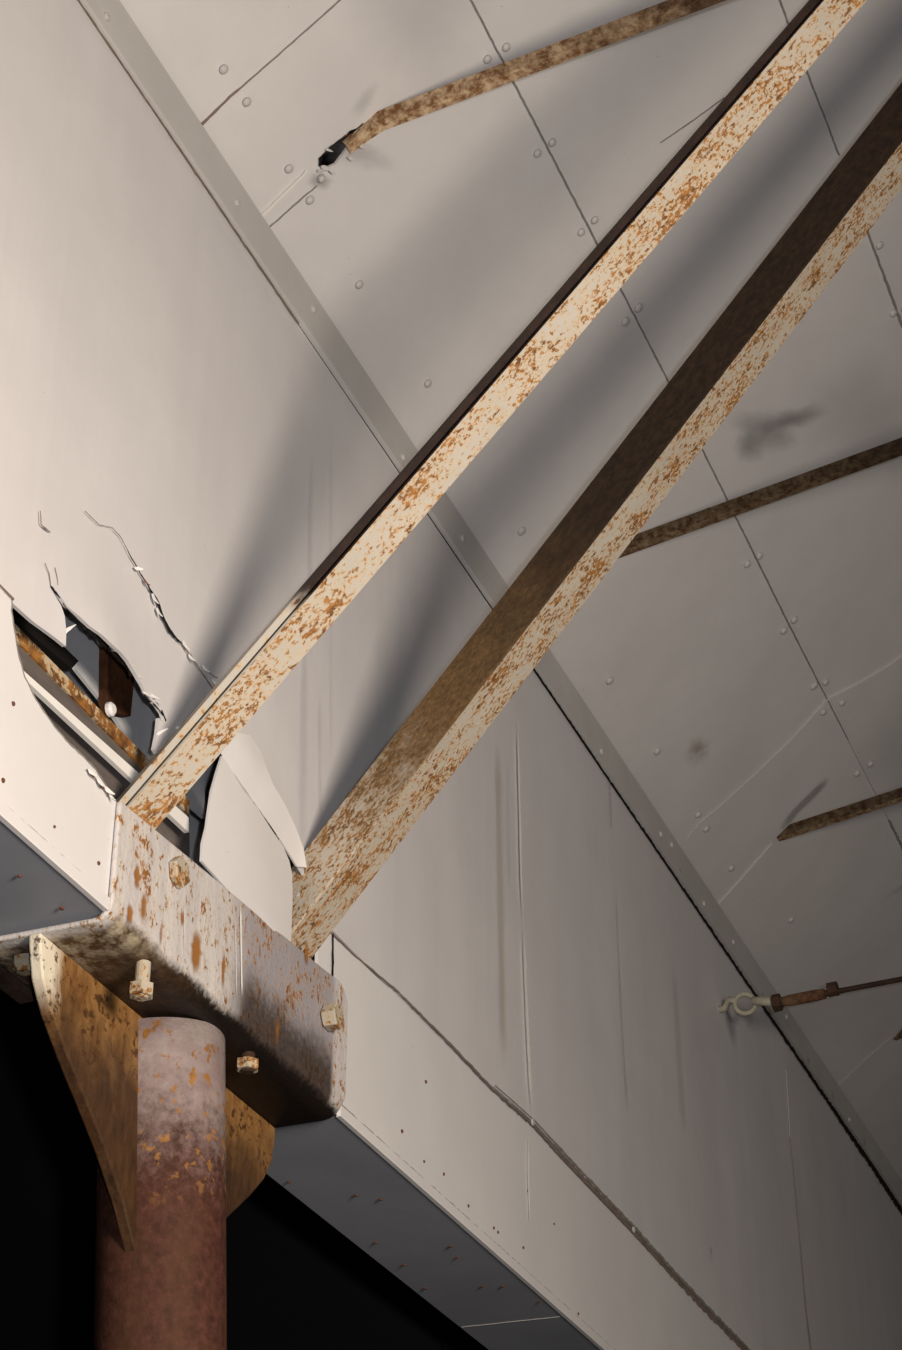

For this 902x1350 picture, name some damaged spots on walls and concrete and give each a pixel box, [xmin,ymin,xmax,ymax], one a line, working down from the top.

corrosion [128,866,146,922]
corrosion [193,935,201,968]